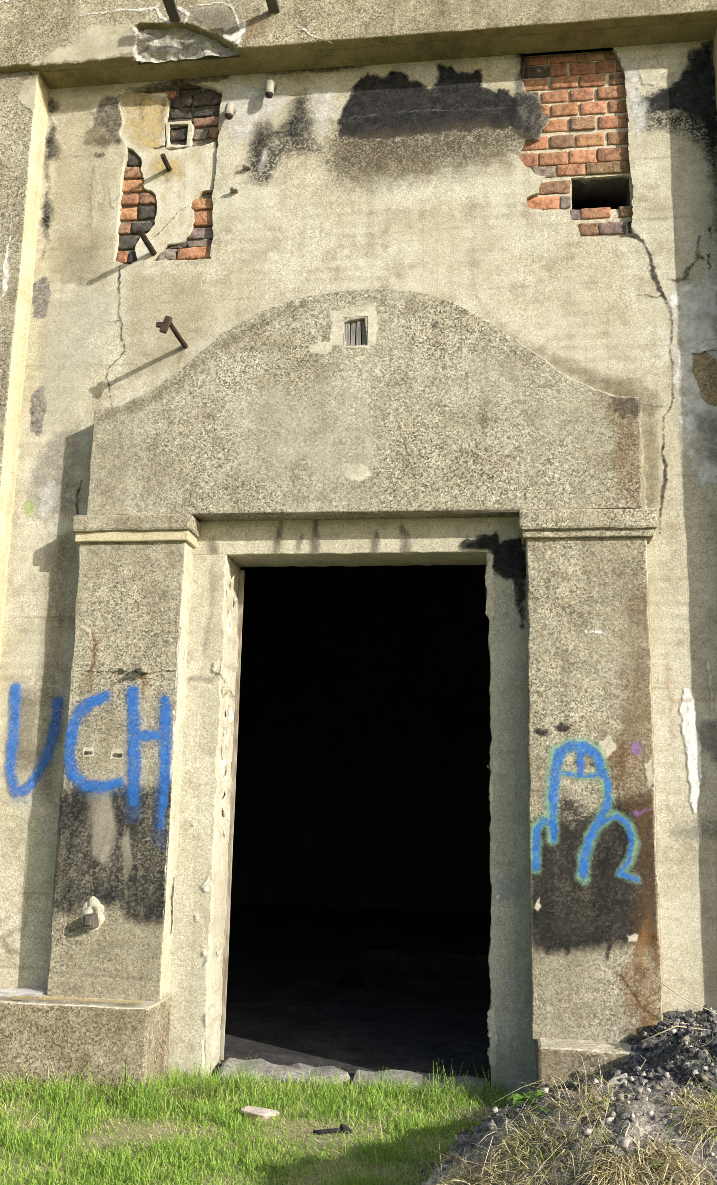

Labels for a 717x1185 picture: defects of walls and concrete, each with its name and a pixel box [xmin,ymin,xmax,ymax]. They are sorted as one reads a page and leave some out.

spalling [131,27,243,63]
flaking render [92,84,222,264]
damp [228,66,517,183]
flaking render [520,51,634,239]
damp [622,56,717,177]
crack [106,266,126,407]
crack [630,228,674,534]
damp [512,571,526,629]
corrosion [598,735,617,758]
corrosion [645,759,654,786]
efflorescence [0,988,44,997]
corrosion [627,923,661,1034]